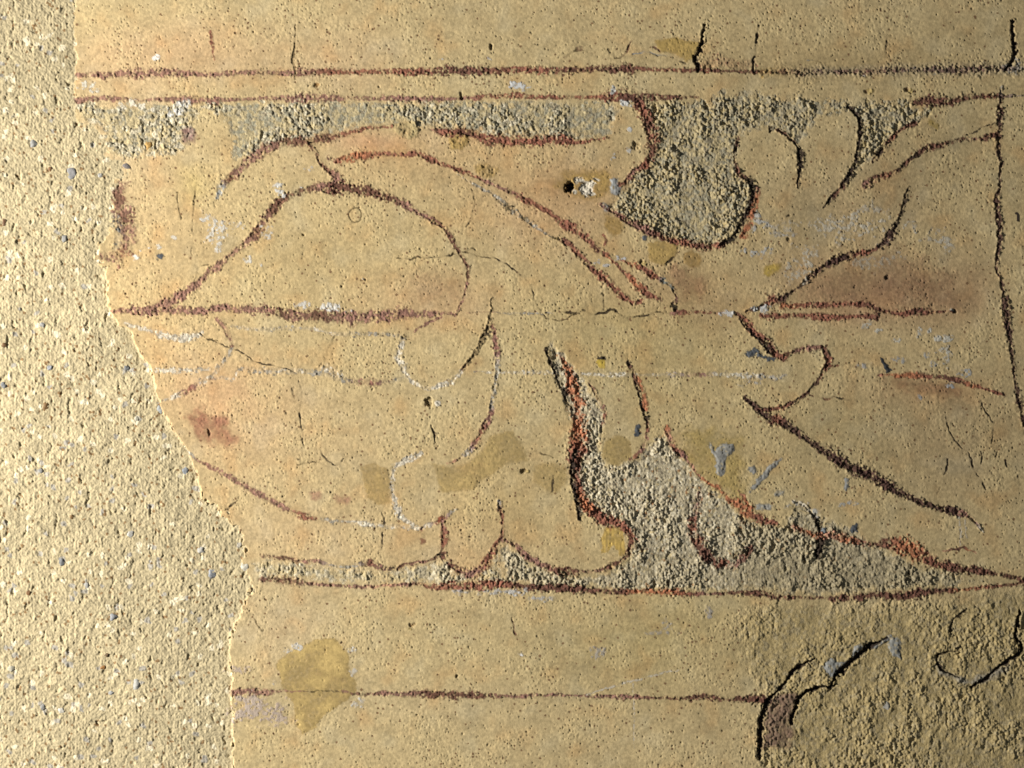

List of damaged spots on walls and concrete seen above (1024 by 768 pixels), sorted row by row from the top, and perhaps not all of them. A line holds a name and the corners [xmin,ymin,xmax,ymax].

crack [693,24,707,73]
crack [1004,20,1019,71]
spalling [76,99,621,163]
spalling [602,89,934,245]
spalling [251,341,1024,768]
crack [936,608,1024,689]
crack [756,637,888,760]